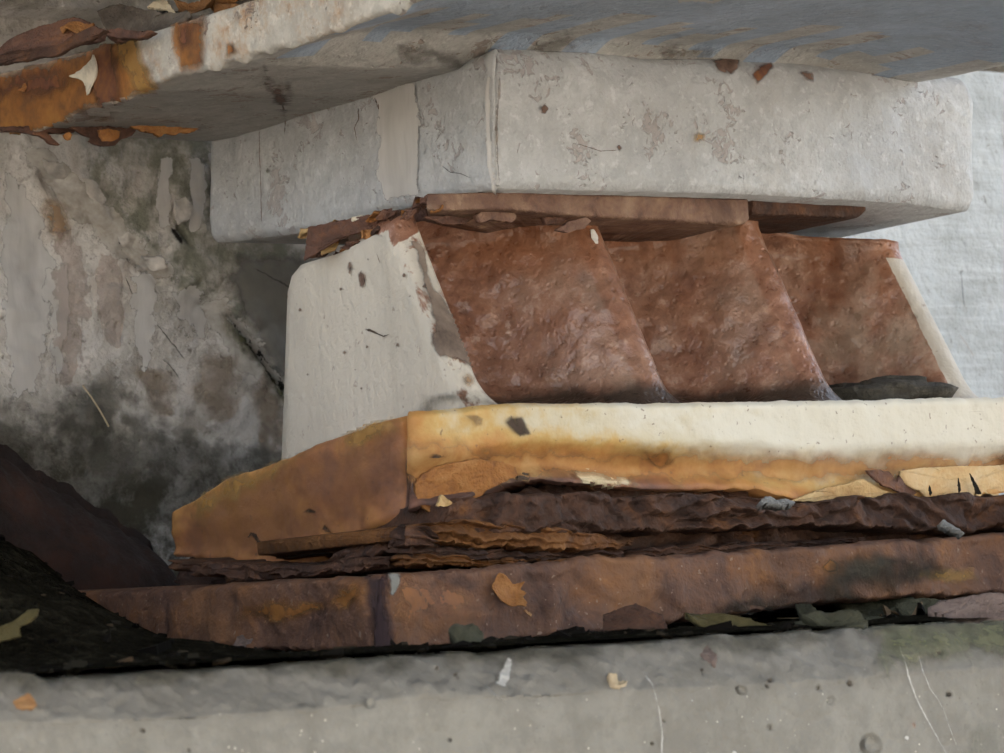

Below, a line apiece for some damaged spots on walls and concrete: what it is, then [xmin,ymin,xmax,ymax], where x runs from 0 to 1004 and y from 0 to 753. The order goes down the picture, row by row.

peeling [69,55,98,95]
corrosion [0,17,197,147]
corrosion [172,18,203,70]
corrosion [412,241,473,384]
corrosion [345,422,390,444]
corrosion [168,443,1004,646]